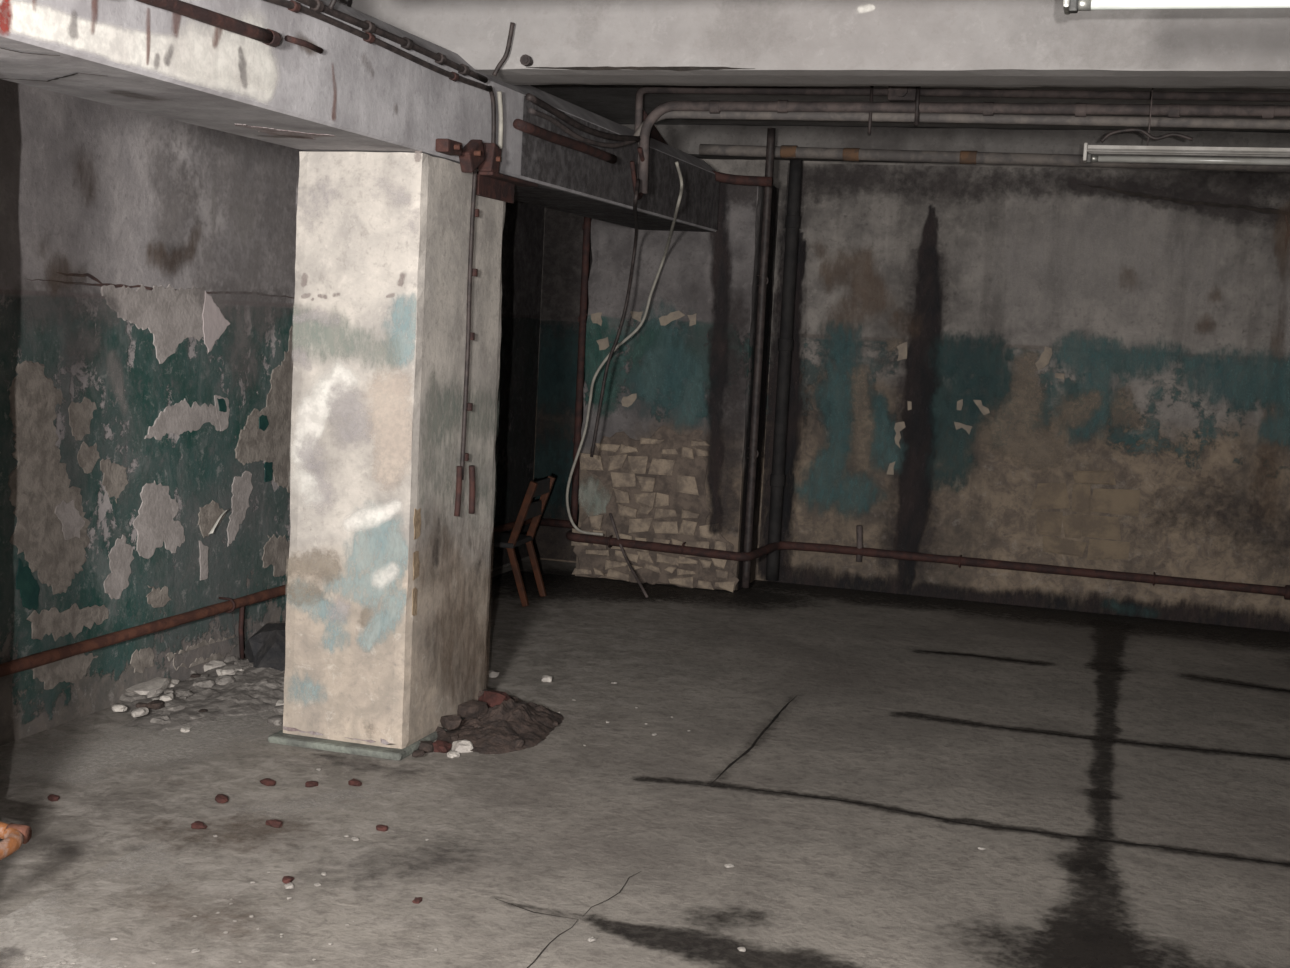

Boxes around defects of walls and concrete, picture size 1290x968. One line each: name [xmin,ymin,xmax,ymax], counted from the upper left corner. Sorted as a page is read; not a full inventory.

corrosion [0,0,12,34]
peeling [8,274,421,690]
water stain [514,98,731,534]
spalling [571,306,739,592]
water stain [490,164,1290,968]
peeling [930,334,1017,491]
crack [495,871,641,968]